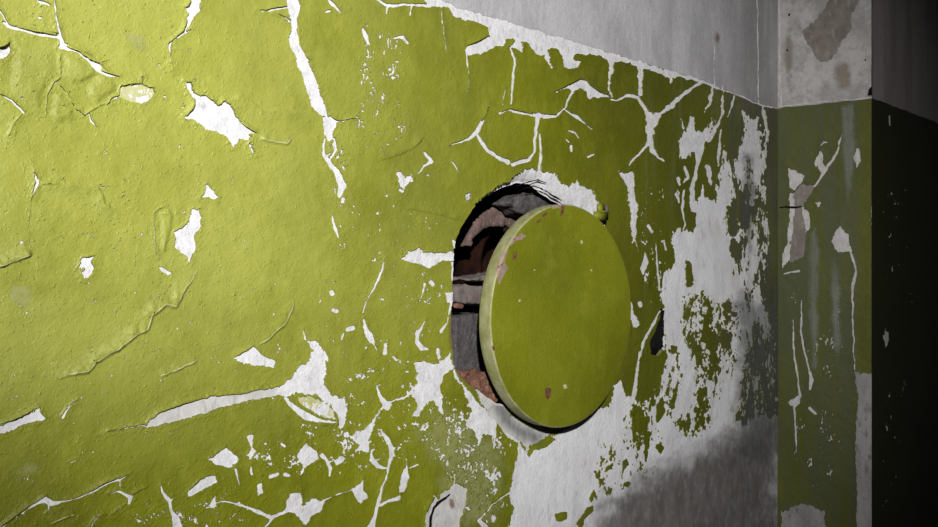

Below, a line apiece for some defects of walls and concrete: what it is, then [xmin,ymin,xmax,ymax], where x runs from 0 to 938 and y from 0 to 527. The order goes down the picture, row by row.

peeling [184,82,260,152]
crack [448,46,735,201]
peeling [174,184,218,262]
peeling [782,136,842,274]
peeling [232,343,275,368]
peeling [276,110,826,527]
peeling [240,480,368,527]